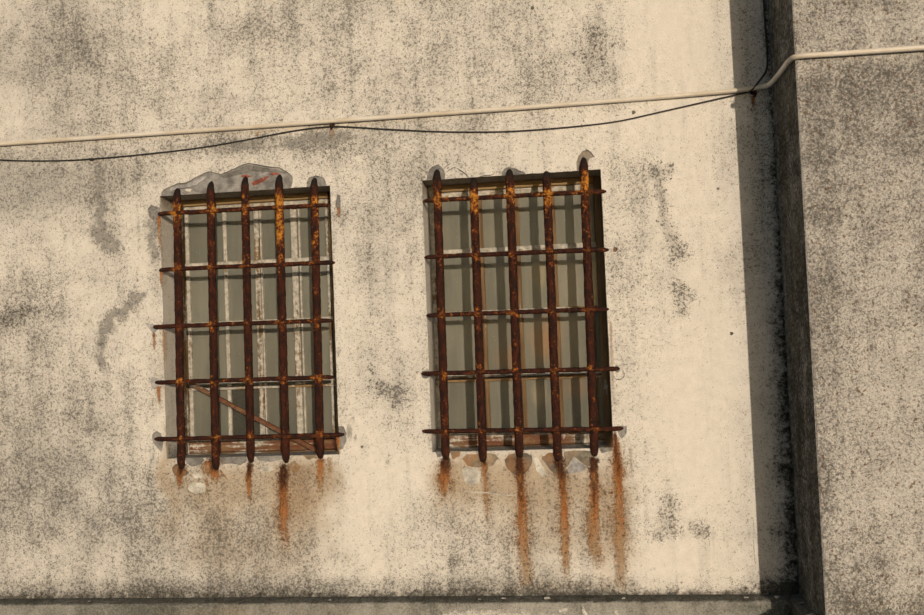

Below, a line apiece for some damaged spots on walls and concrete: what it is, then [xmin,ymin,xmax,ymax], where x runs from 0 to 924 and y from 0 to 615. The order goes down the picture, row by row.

flaking render [162,163,293,196]
leakage [0,85,799,599]
rust [277,464,289,542]
rust [316,459,331,489]
rust [437,458,453,496]
rust [515,458,531,580]
flaking render [450,448,611,486]
rust [554,457,570,571]
rust [587,457,601,562]
rust [610,431,627,581]
leakage [438,606,588,615]